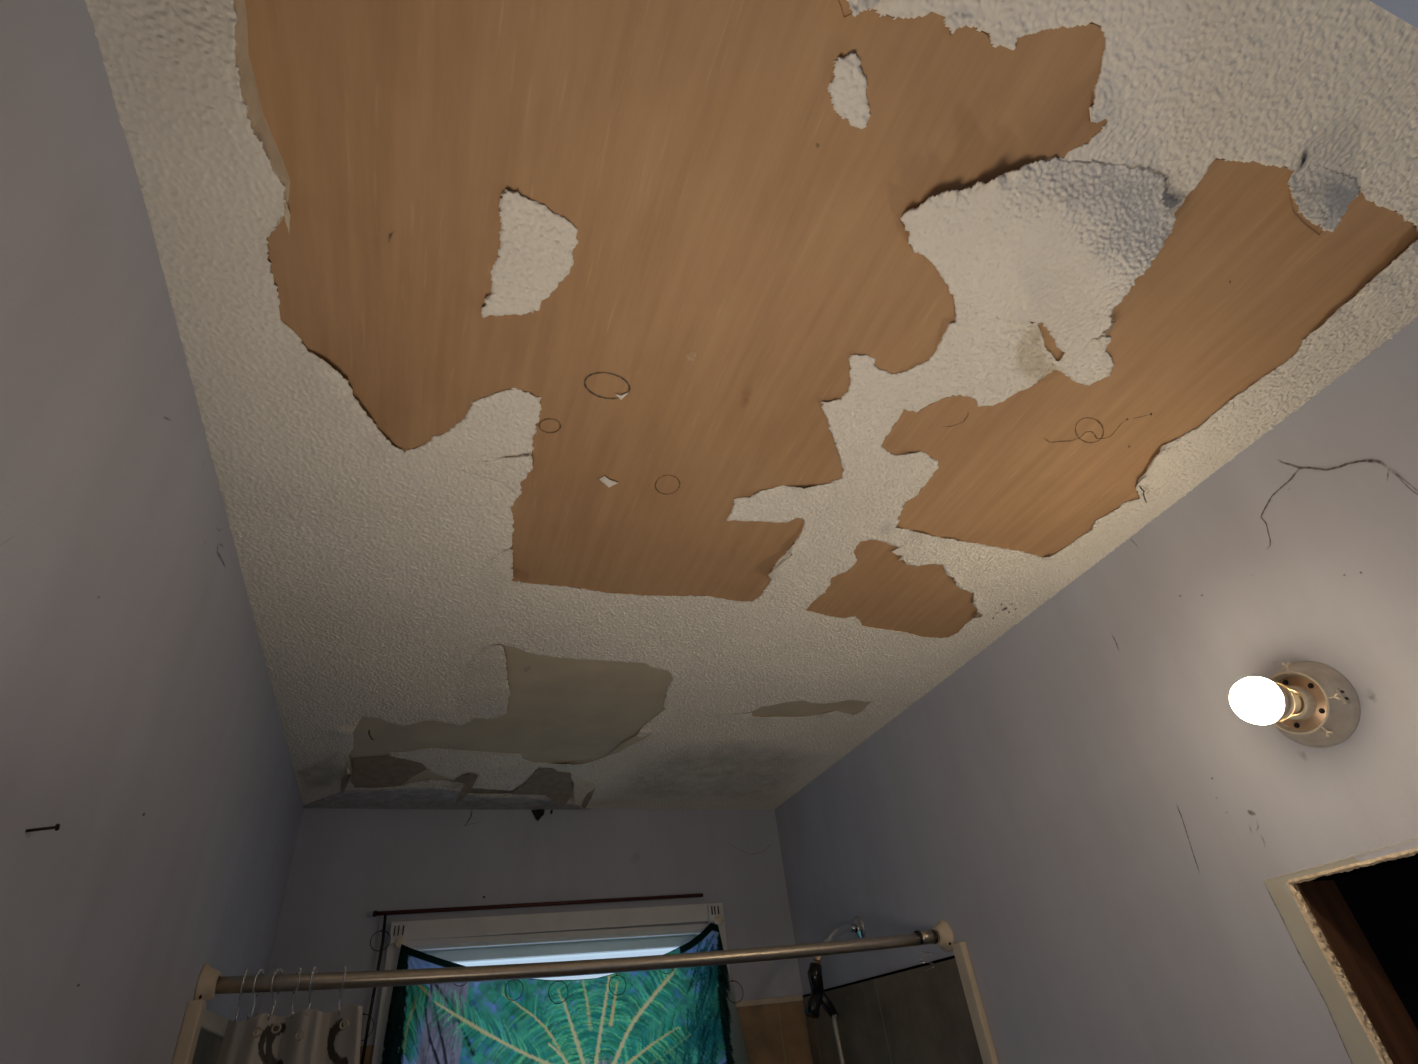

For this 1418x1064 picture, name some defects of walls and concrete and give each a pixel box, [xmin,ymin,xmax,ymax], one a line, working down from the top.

peeling [85,0,1418,602]
crack [1261,459,1417,545]
peeling [806,540,983,638]
peeling [340,644,673,821]
peeling [714,700,872,719]